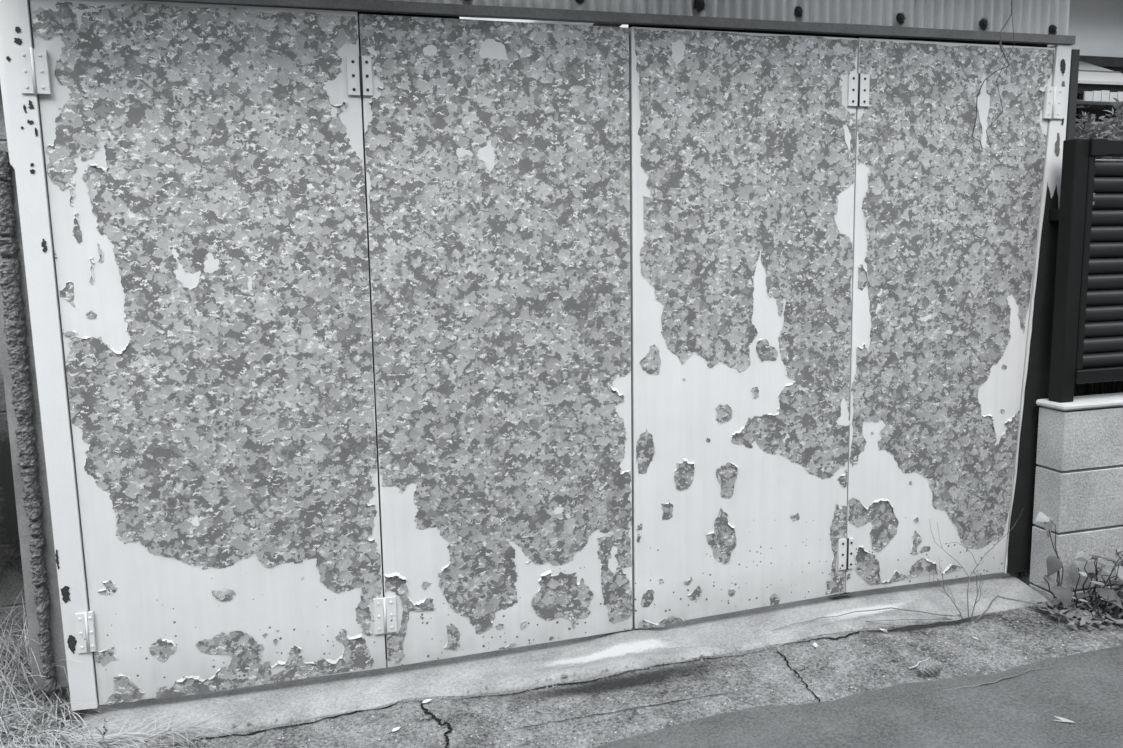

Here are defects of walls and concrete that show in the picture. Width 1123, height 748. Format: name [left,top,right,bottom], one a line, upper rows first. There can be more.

peeling [634,28,1054,565]
peeling [32,1,632,699]
peeling [640,577,665,607]
peeling [638,616,685,629]
peeling [683,574,702,601]
peeling [825,498,966,595]
peeling [105,674,145,705]
crack [164,615,990,748]